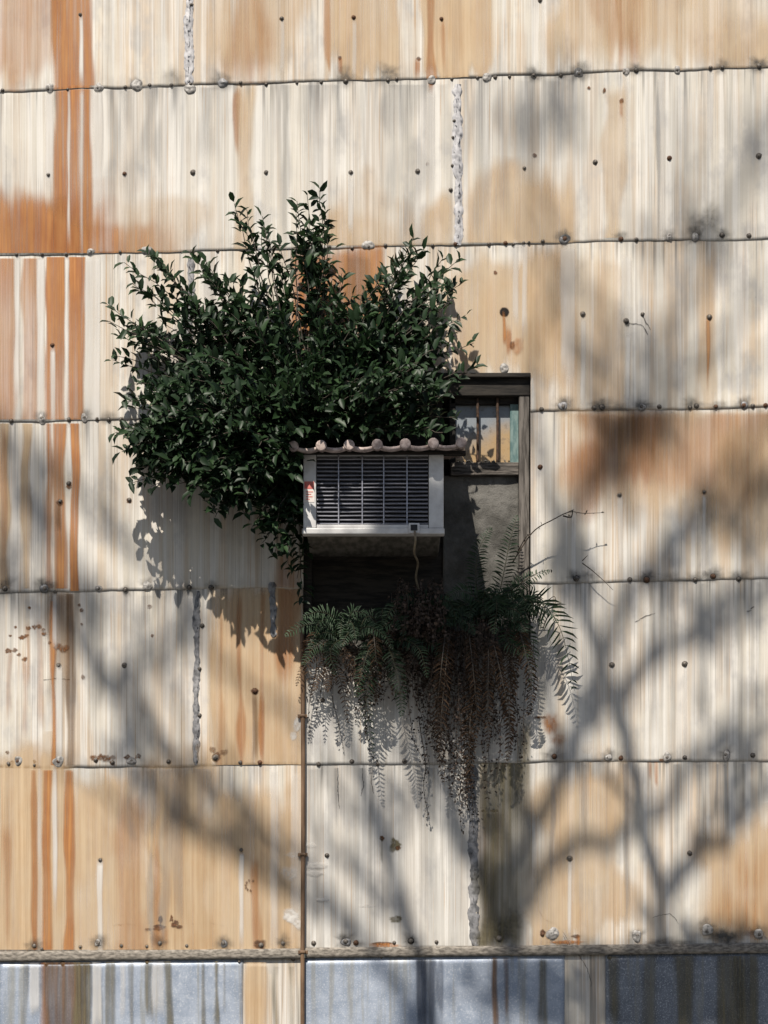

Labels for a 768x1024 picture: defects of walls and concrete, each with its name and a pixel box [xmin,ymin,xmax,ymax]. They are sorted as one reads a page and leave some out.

corrosion [0,0,301,1024]
corrosion [465,167,572,378]